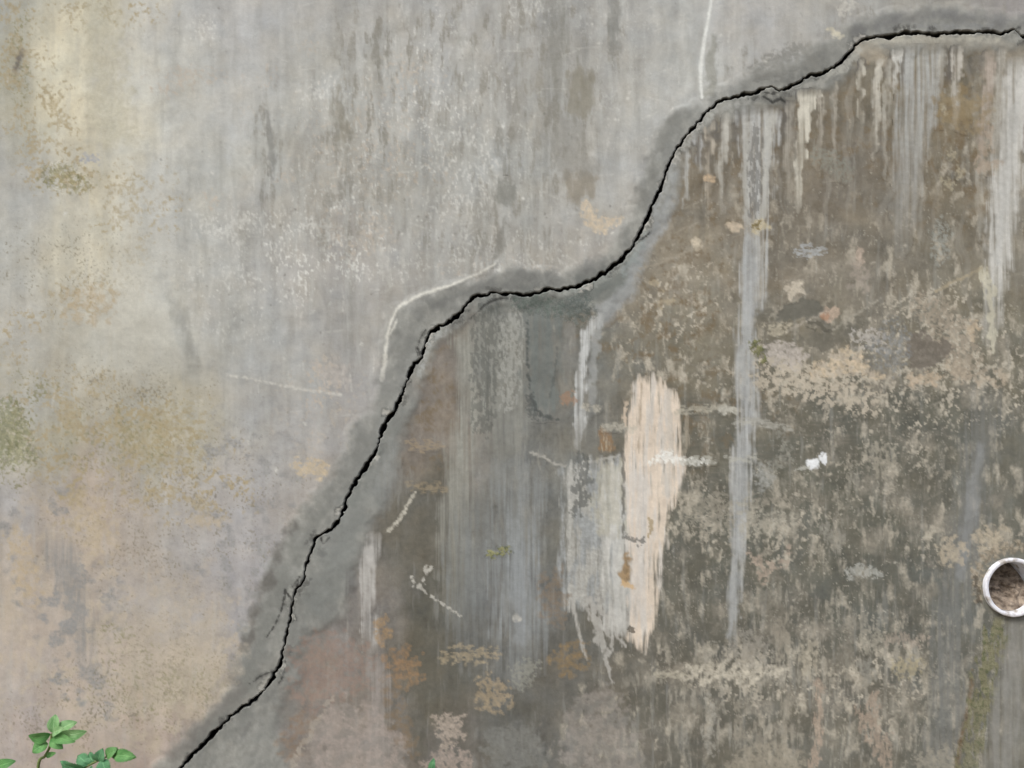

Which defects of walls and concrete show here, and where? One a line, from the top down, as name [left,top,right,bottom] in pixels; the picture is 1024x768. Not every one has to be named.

crack [892,23,917,33]
crack [926,24,938,32]
water stain [342,436,401,722]
water stain [431,301,610,690]
peeling [302,370,801,768]
crack [178,27,1024,768]
water stain [680,31,1024,646]
water stain [920,382,1006,754]
water stain [981,615,1024,768]